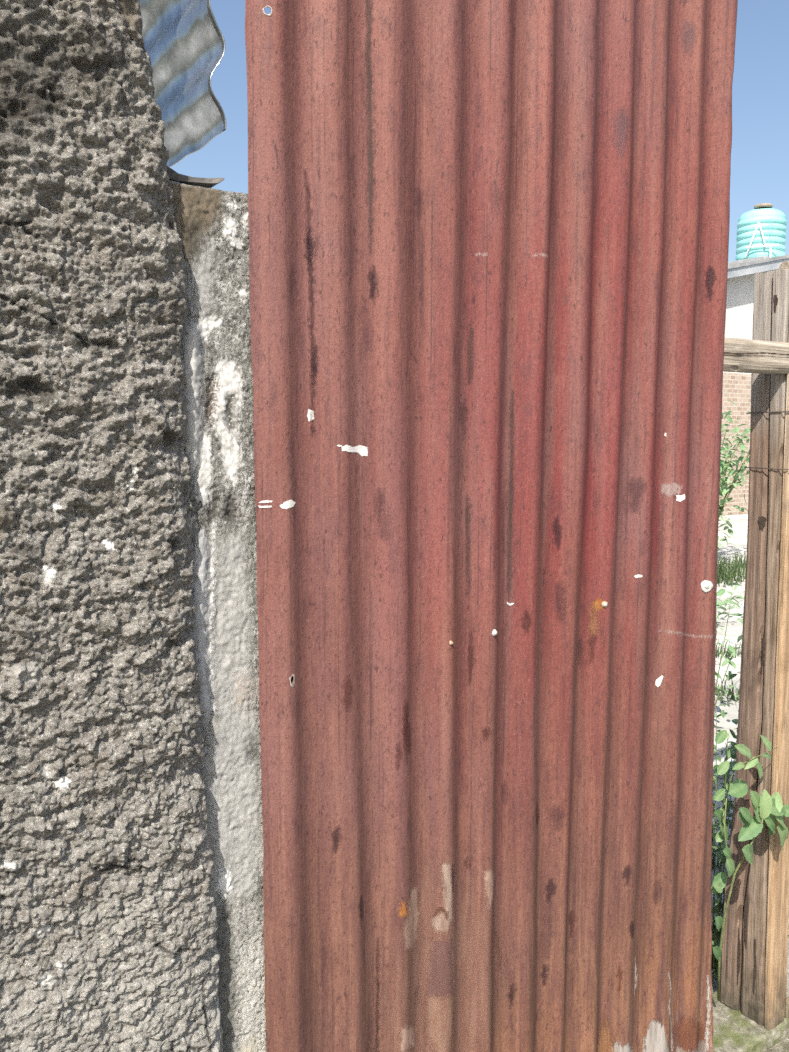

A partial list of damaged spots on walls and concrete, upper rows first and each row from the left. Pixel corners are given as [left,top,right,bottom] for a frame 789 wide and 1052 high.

damp [195,356,244,506]
peeling [433,864,452,931]
peeling [401,1026,414,1052]
peeling [612,972,711,1052]
rust [679,1021,703,1052]